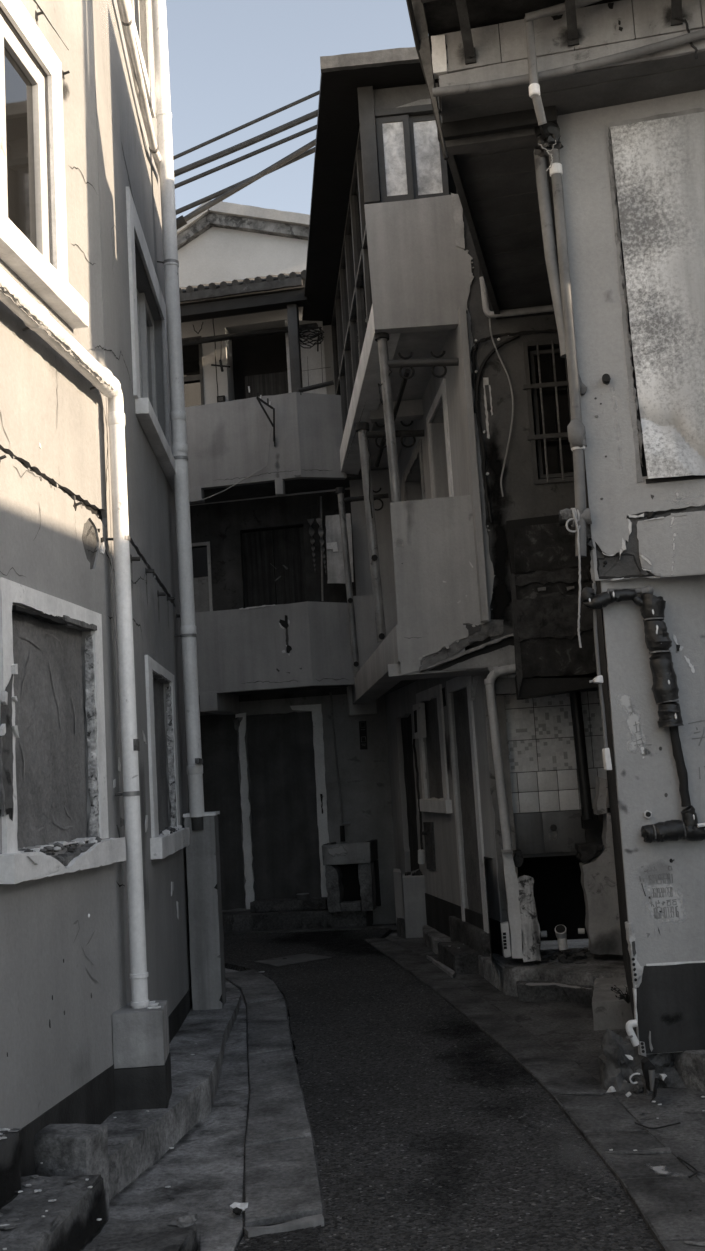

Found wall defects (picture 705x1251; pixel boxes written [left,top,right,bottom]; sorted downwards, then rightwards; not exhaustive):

crack [0,412,60,541]
spalling [586,505,705,588]